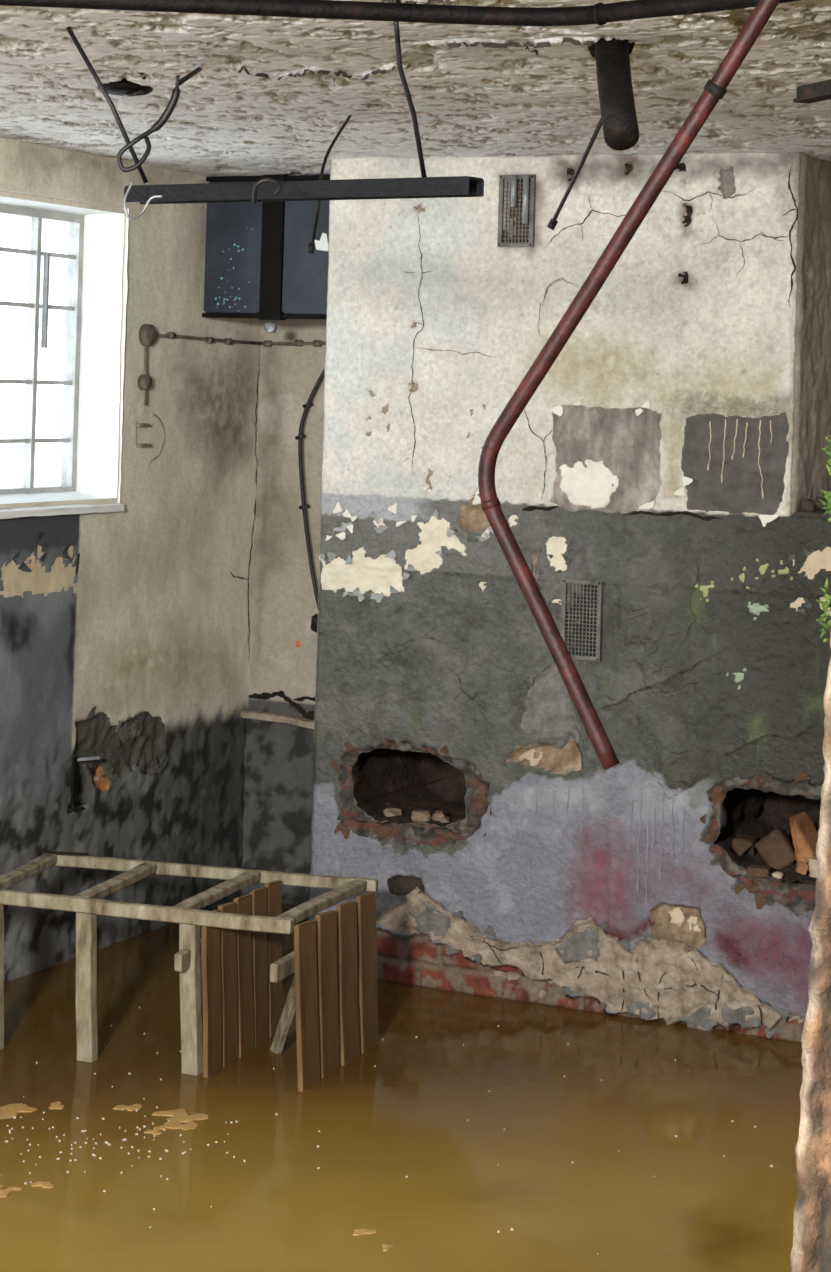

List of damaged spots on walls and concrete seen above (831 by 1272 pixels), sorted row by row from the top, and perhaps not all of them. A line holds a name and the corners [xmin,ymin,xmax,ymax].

crack [550,161,798,307]
crack [406,206,496,481]
crack [537,278,574,335]
peeling [549,397,662,513]
peeling [0,532,80,598]
peeling [319,477,494,603]
peeling [787,547,831,580]
peeling [790,597,831,614]
spalling [506,664,587,775]
spalling [330,739,492,848]
spalling [700,771,823,916]
spalling [376,875,805,1042]